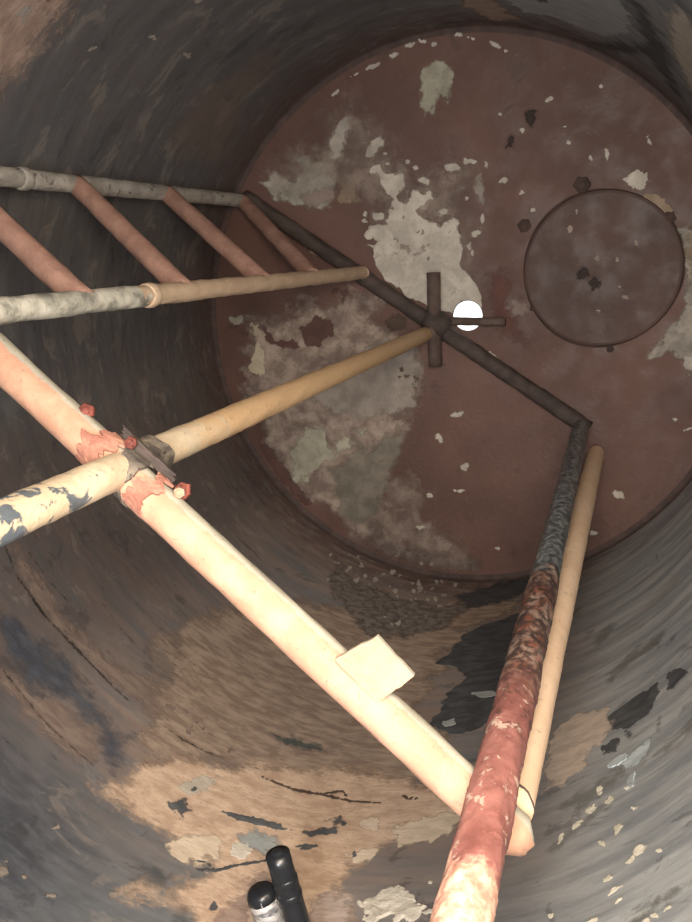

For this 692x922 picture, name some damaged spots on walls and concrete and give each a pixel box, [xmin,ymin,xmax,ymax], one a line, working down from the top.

peeling [389,39,437,58]
peeling [420,61,454,114]
peeling [263,105,488,313]
peeling [647,227,692,370]
peeling [293,598,373,650]
peeling [329,553,519,739]
peeling [544,668,689,790]
peeling [101,606,460,922]
crack [262,776,381,804]
peeling [557,785,614,845]
peeling [625,844,662,864]
peeling [603,875,623,904]